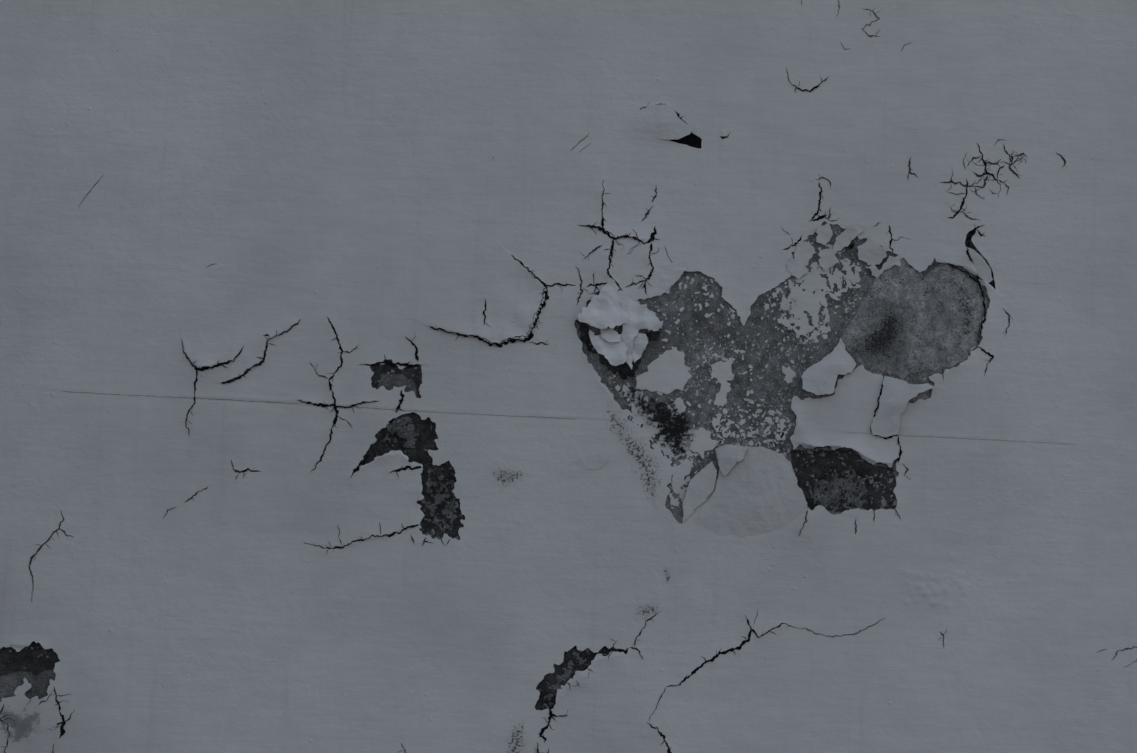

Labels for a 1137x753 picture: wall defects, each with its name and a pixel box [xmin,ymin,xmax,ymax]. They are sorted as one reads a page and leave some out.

crack [907,139,1027,220]
crack [429,181,672,347]
crack [61,318,572,471]
spalling [304,335,465,556]
peeling [574,222,995,538]
spalling [0,641,75,753]
spalling [535,613,658,753]
crack [648,611,884,753]